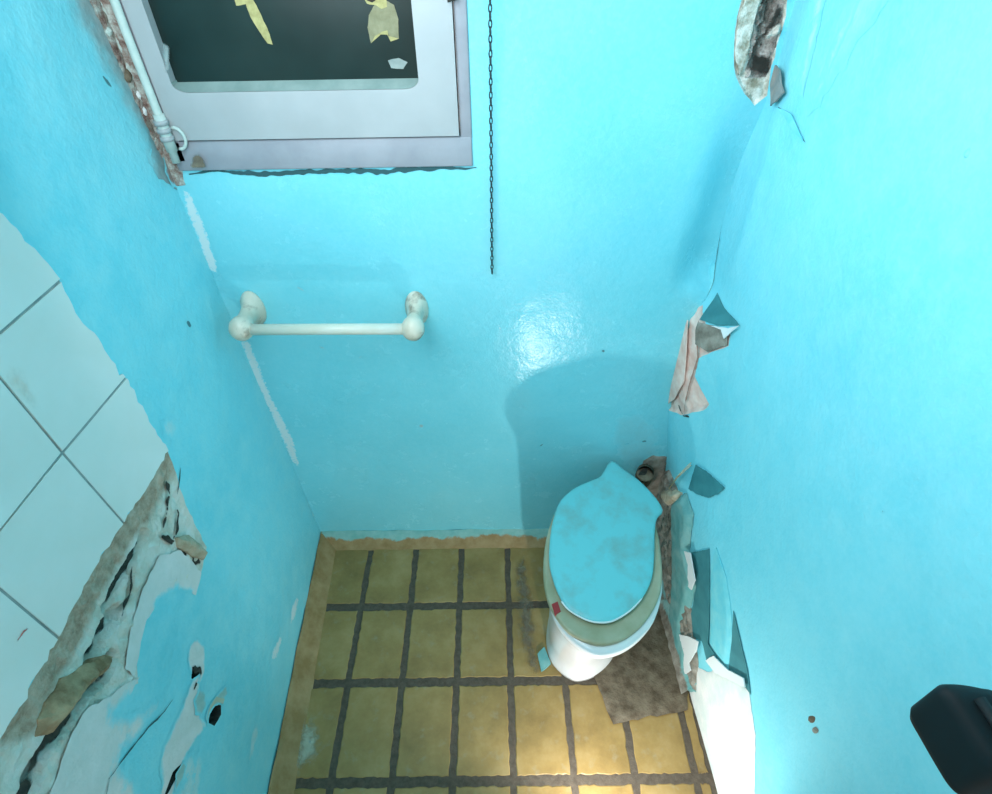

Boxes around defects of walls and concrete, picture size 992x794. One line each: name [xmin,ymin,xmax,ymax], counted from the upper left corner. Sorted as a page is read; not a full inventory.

spalling [0,452,228,794]